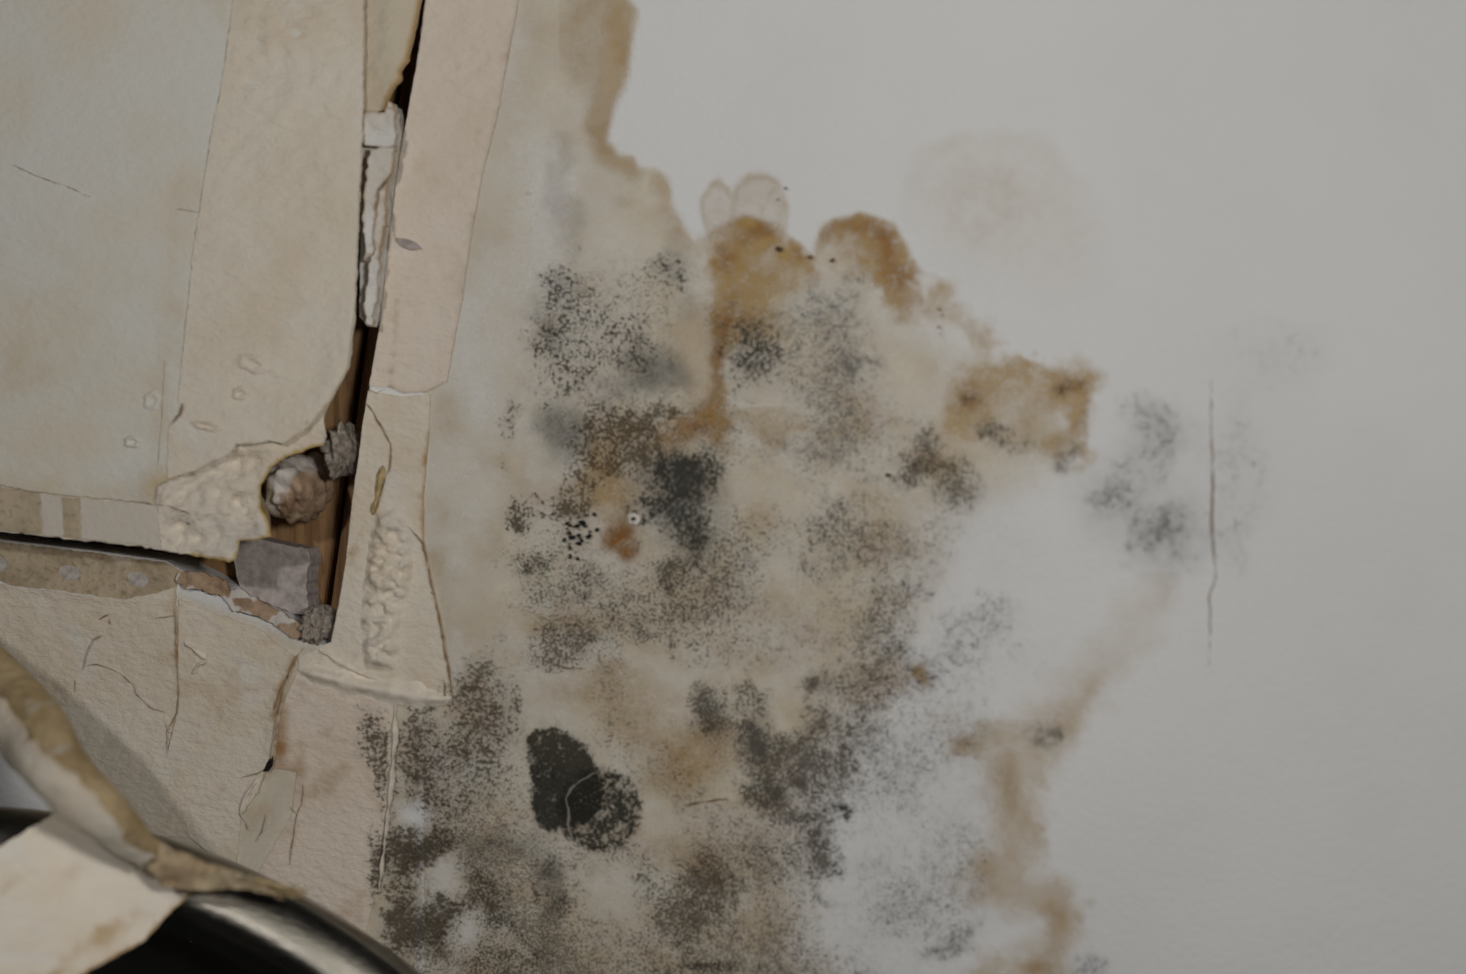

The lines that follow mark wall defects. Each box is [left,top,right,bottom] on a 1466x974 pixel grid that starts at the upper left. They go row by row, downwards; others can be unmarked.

spalling [361,101,421,327]
damp [357,0,1034,974]
crack [1205,380,1218,665]
crack [74,611,179,747]
peeling [0,541,296,863]
crack [239,786,303,865]
crack [243,649,303,777]
damp [238,632,315,872]
damp [957,709,1079,974]